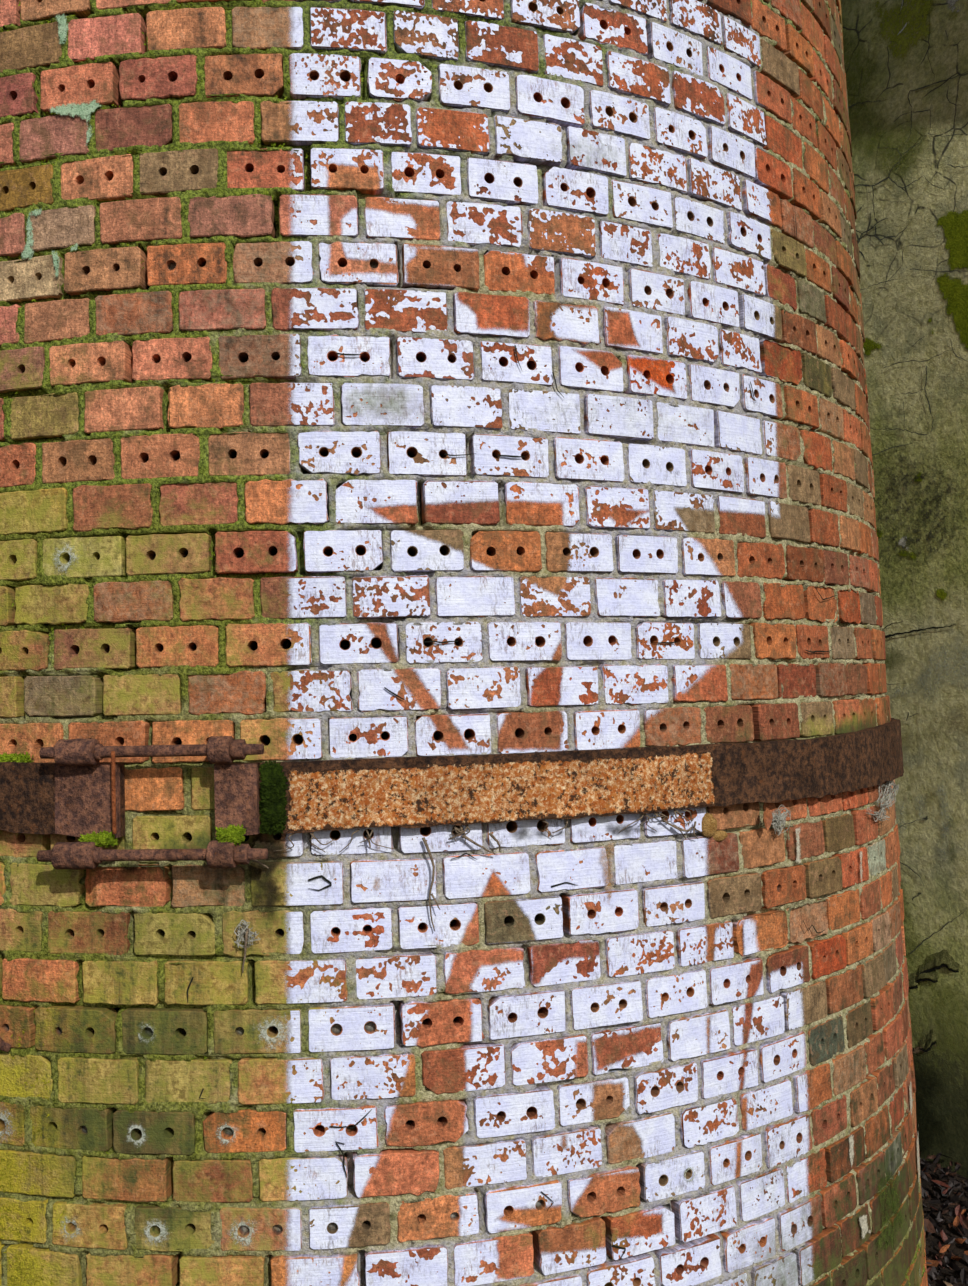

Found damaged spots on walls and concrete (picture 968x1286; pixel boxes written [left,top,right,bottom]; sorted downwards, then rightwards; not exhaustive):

peeling [292,0,766,300]
crack [848,30,968,287]
spalling [291,383,381,476]
peeling [291,288,623,398]
spalling [669,327,802,408]
crack [871,336,968,455]
peeling [298,577,476,661]
crack [882,621,955,639]
rust [286,752,715,831]
spalling [287,956,738,1175]
leakage [909,1066,940,1182]
spalling [610,1189,736,1286]